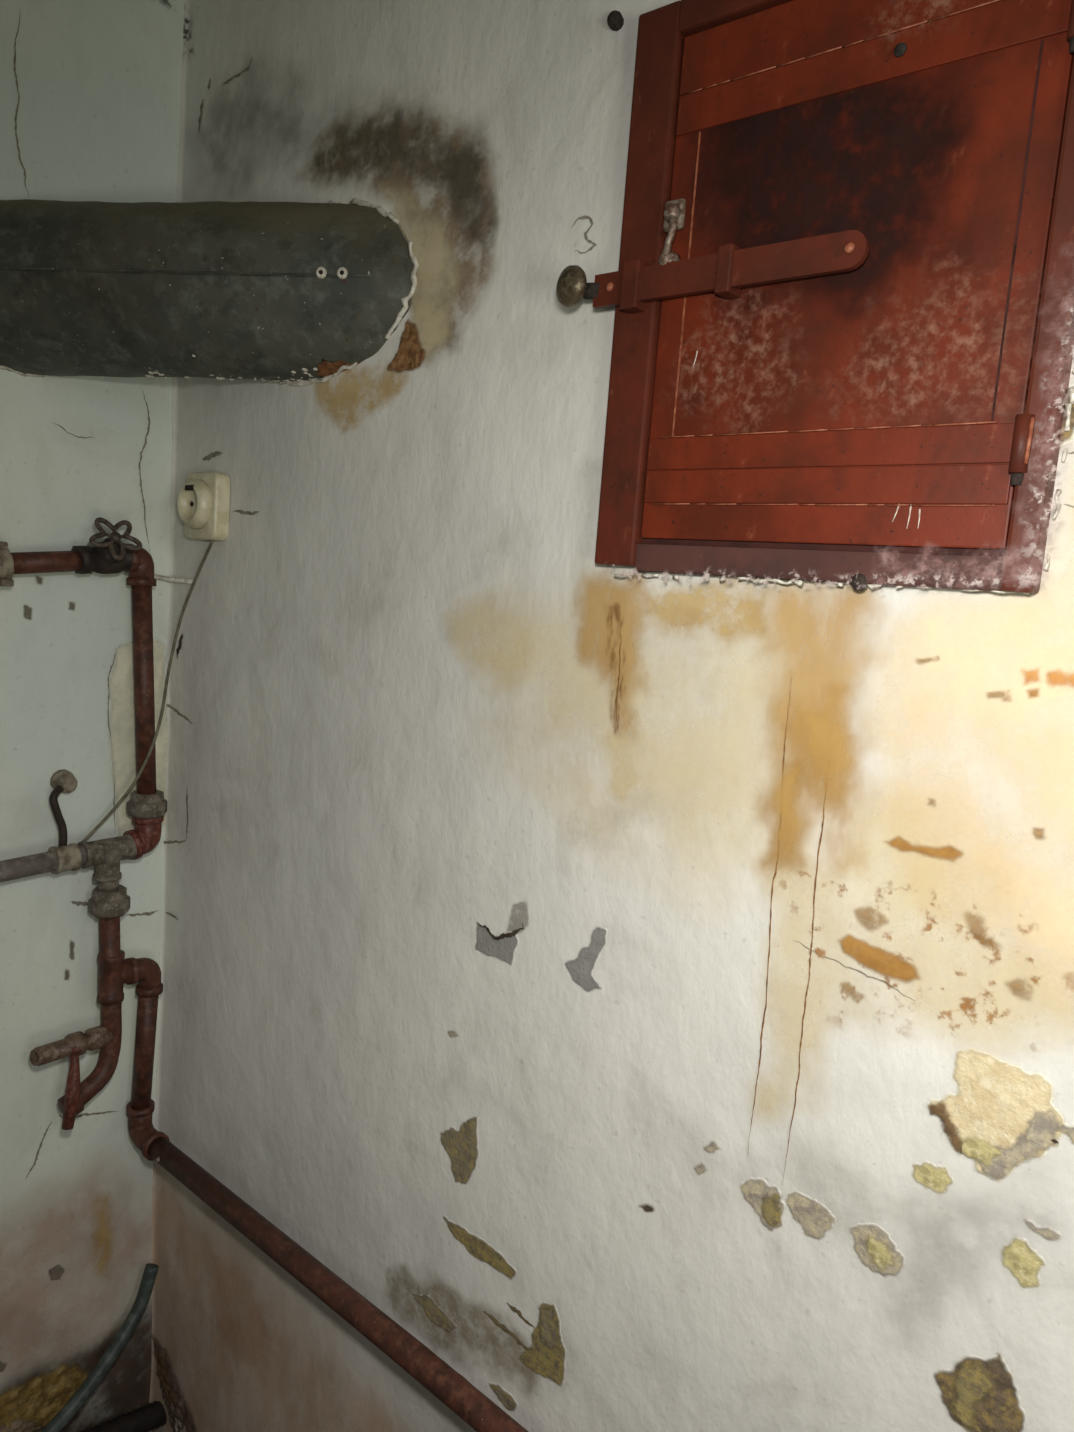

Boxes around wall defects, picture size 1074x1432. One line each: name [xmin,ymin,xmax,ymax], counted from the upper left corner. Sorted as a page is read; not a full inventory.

crack [14,12,29,194]
leakage [384,241,418,340]
leakage [266,362,358,386]
leakage [580,585,762,745]
leakage [773,594,863,857]
peeling [887,601,1074,840]
spalling [441,1116,479,1185]
spalling [927,1047,1074,1182]
spalling [740,1177,905,1278]
leakage [0,1191,340,1432]
spalling [483,1301,566,1387]
spalling [934,1353,1027,1432]